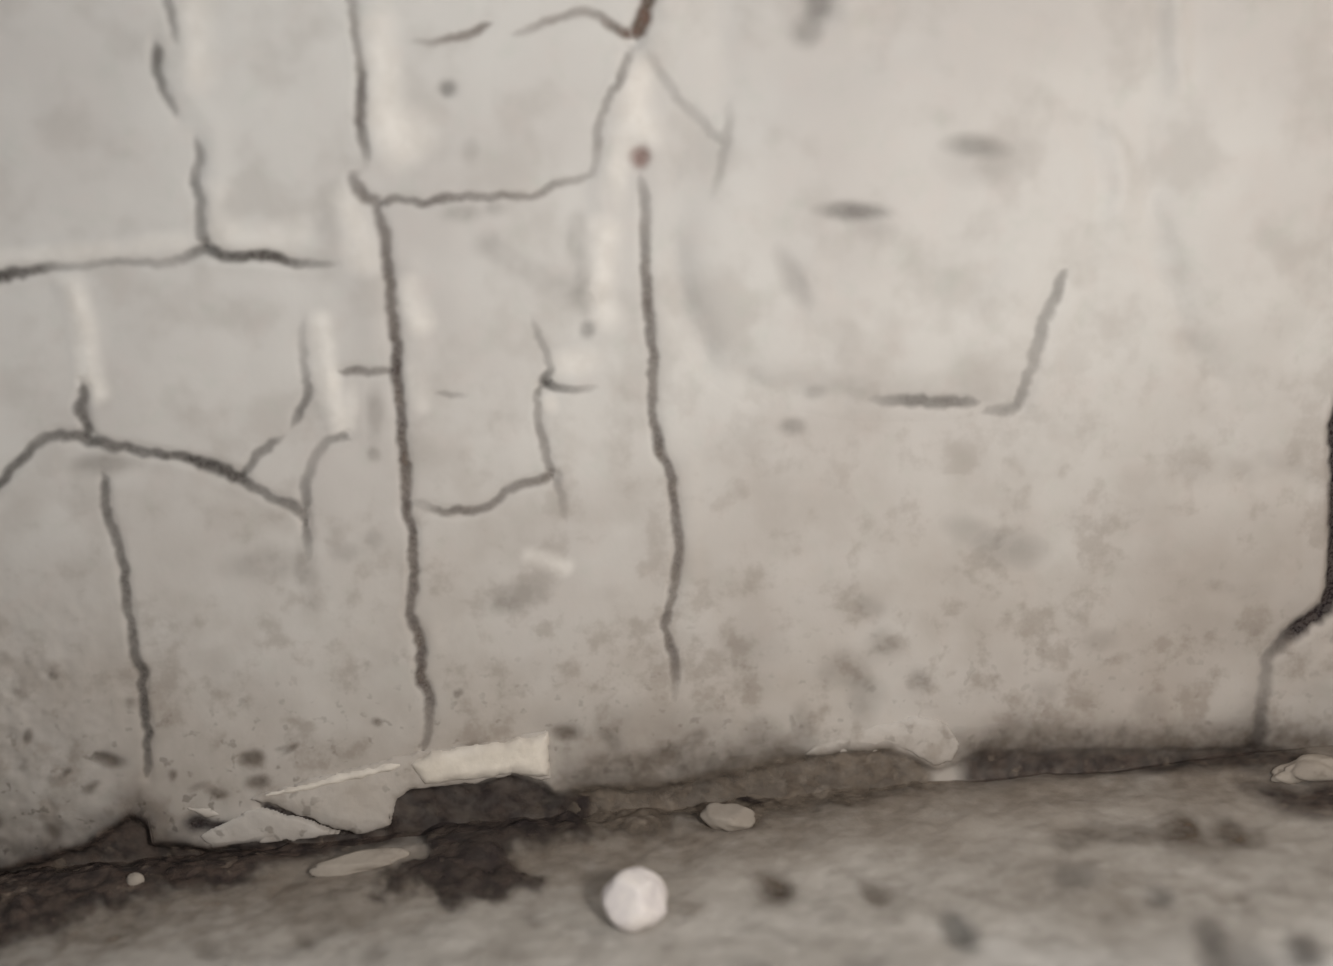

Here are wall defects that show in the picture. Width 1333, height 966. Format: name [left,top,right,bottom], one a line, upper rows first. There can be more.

crack [610,0,654,38]
crack [356,72,364,127]
crack [0,266,42,281]
crack [199,241,290,265]
crack [644,280,656,359]
crack [0,387,251,487]
crack [383,231,433,704]
crack [654,425,680,544]
crack [1283,414,1333,638]
crack [105,485,152,755]
flaking render [187,730,551,848]
flaking render [805,716,959,766]